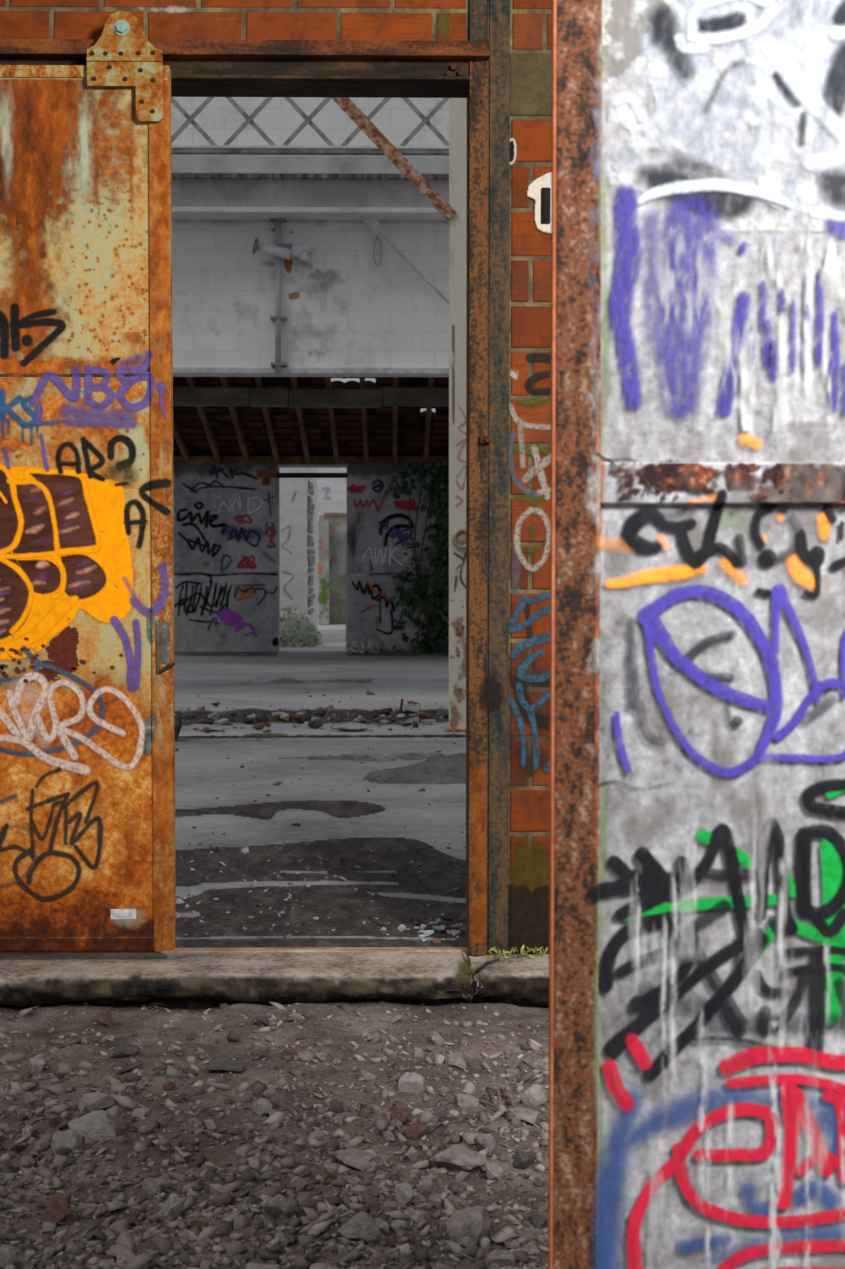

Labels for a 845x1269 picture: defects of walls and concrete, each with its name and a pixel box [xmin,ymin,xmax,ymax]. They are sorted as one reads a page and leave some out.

corrosion [0,79,173,489]
corrosion [596,390,845,554]
corrosion [0,652,174,953]